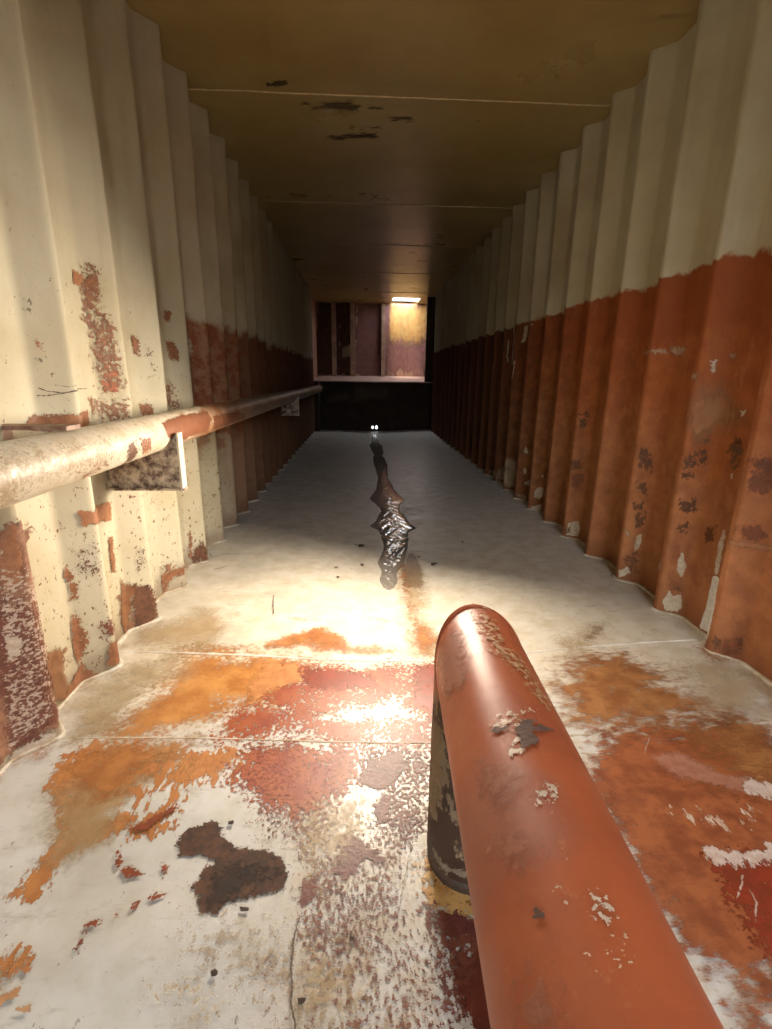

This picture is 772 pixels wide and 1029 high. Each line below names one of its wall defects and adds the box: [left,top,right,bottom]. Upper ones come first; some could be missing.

peeling [27,262,158,432]
peeling [166,339,180,362]
peeling [165,380,183,410]
peeling [77,501,112,527]
corrosion [121,580,137,633]
peeling [618,529,642,578]
peeling [662,552,687,612]
peeling [699,530,726,638]
peeling [0,518,208,767]
corrosion [3,628,434,915]
corrosion [490,627,772,1029]
corrosion [72,891,169,958]